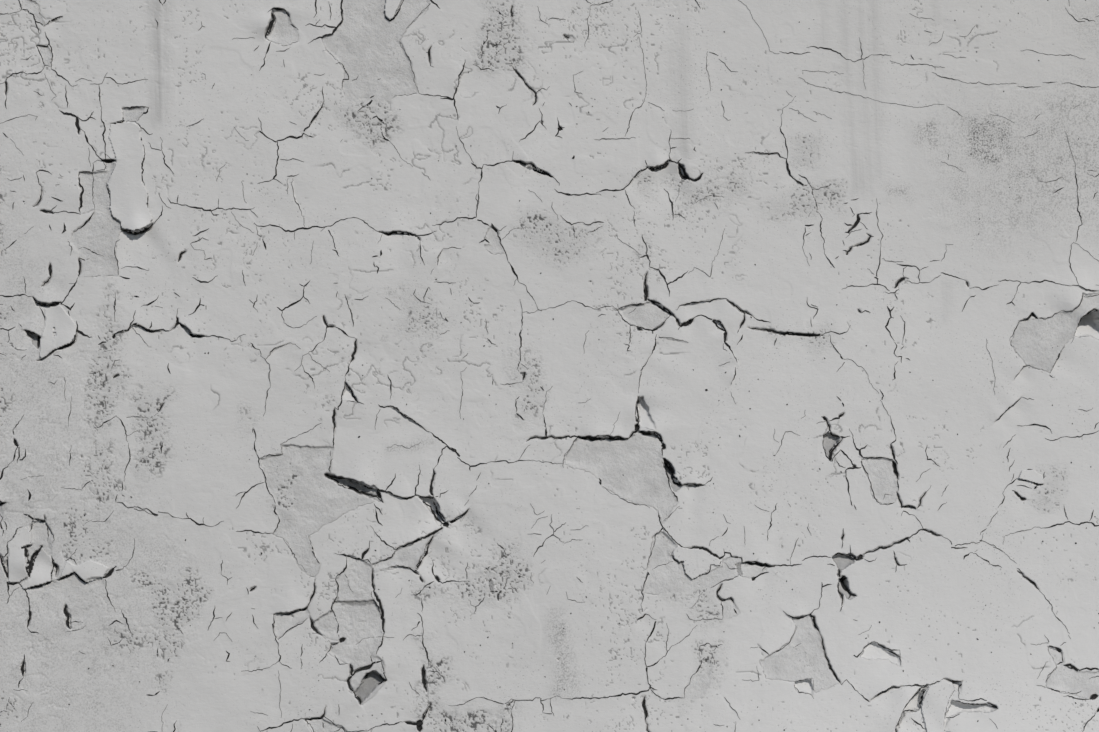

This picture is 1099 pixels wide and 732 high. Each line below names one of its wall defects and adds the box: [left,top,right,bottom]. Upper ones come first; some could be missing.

crack [0,0,148,249]
spalling [322,0,430,105]
peeling [0,106,172,361]
crack [85,0,1099,613]
crack [0,415,26,480]
peeling [0,501,120,633]
spalling [245,444,468,732]
crack [403,598,445,694]
spalling [488,425,743,621]
crack [631,507,722,732]
spalling [746,584,998,732]
crack [1033,638,1099,671]